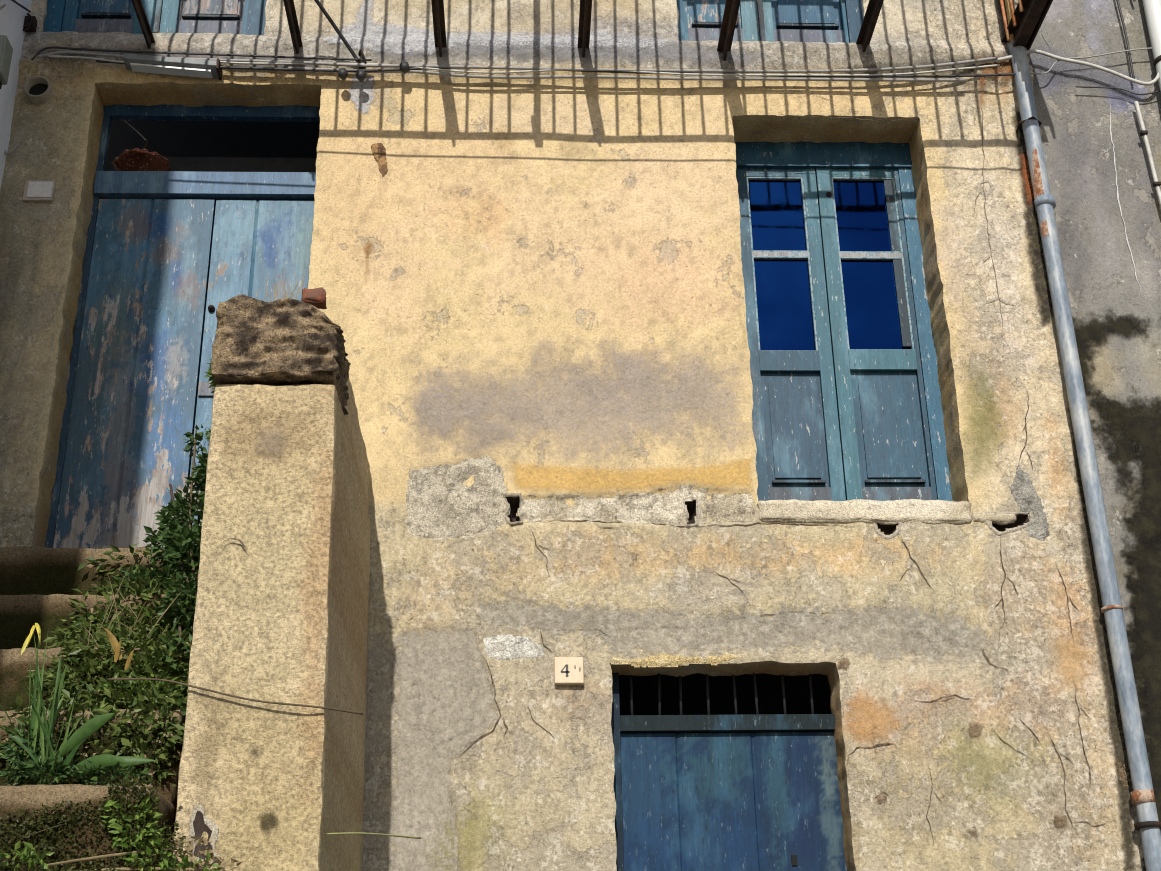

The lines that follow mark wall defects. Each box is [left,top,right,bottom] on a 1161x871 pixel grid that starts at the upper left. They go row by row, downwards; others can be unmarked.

corrosion [1023,148,1044,199]
corrosion [1040,220,1049,238]
crack [1017,387,1033,469]
spalling [406,456,755,538]
spalling [1009,468,1050,541]
crack [899,541,934,590]
crack [982,540,1018,669]
crack [1056,565,1079,640]
leakage [1068,314,1161,871]
crack [457,657,552,759]
crack [910,694,970,702]
crack [1048,676,1107,834]